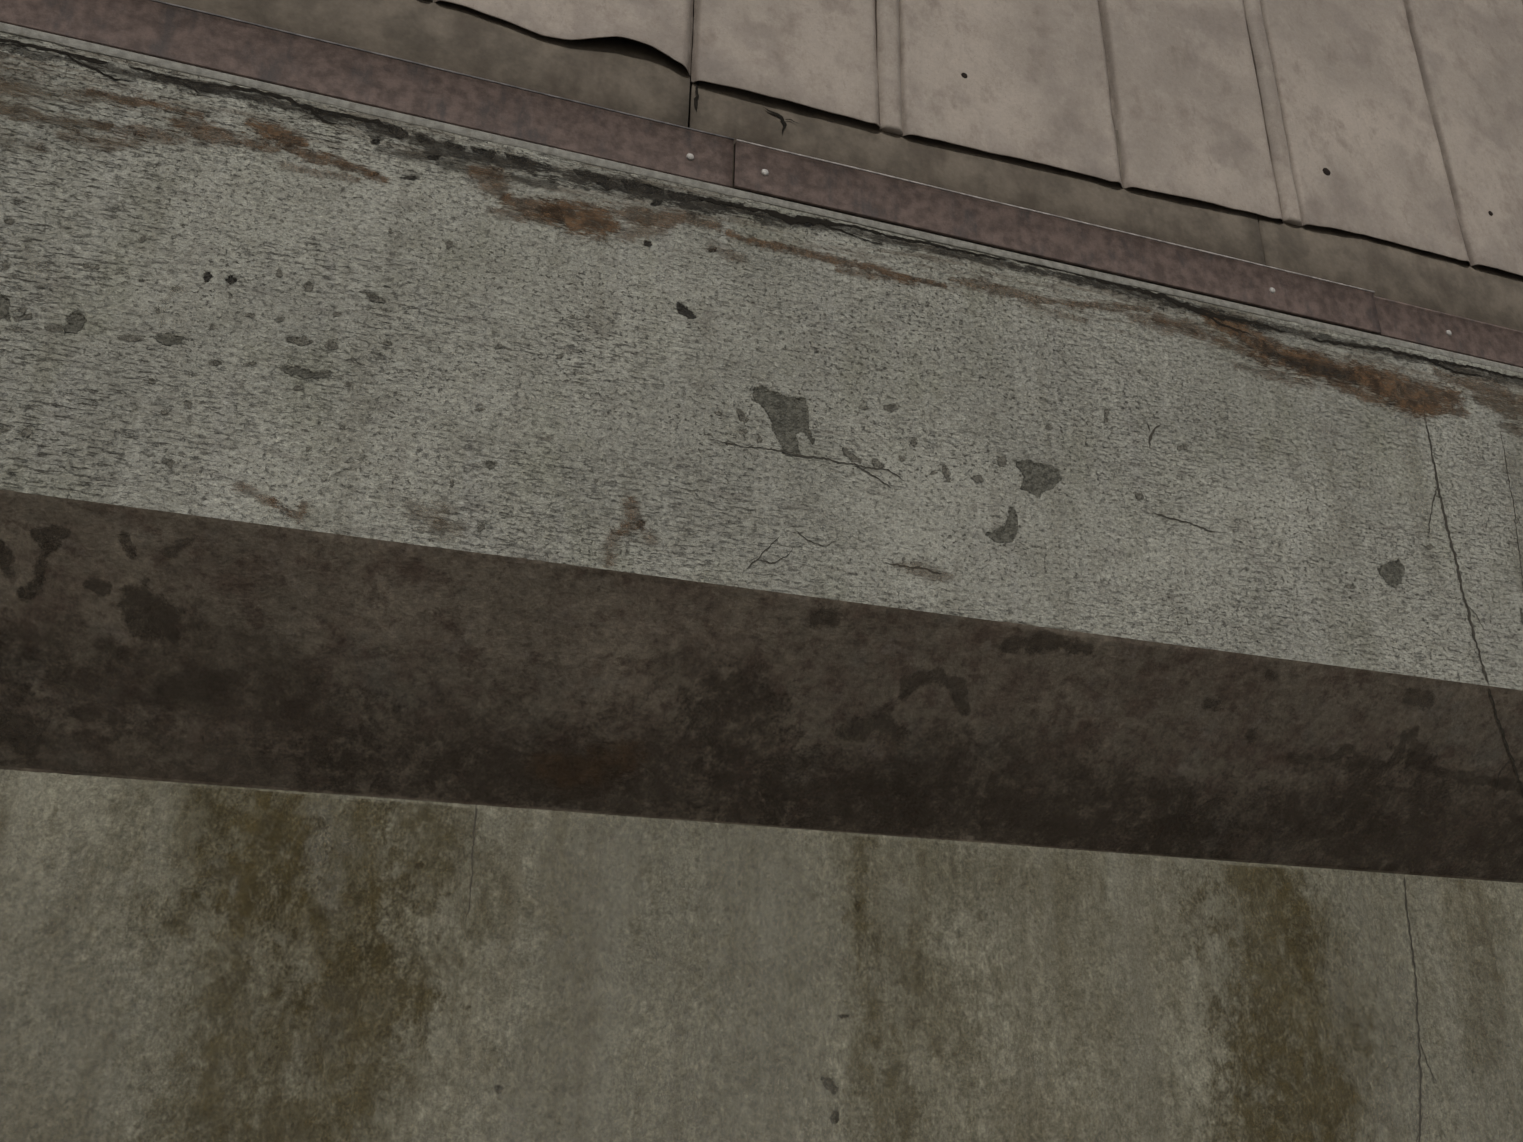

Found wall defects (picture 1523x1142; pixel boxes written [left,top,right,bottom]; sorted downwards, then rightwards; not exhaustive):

corrosion [84,87,390,183]
corrosion [466,165,948,288]
spalling [714,385,815,456]
spalling [985,506,1018,543]
spalling [998,455,1062,498]
crack [698,197,1523,792]
corrosion [1200,309,1523,429]
spalling [1377,559,1405,588]
damp [206,790,309,928]
damp [301,798,436,1135]
damp [1215,866,1360,1142]
crack [1404,876,1437,1142]